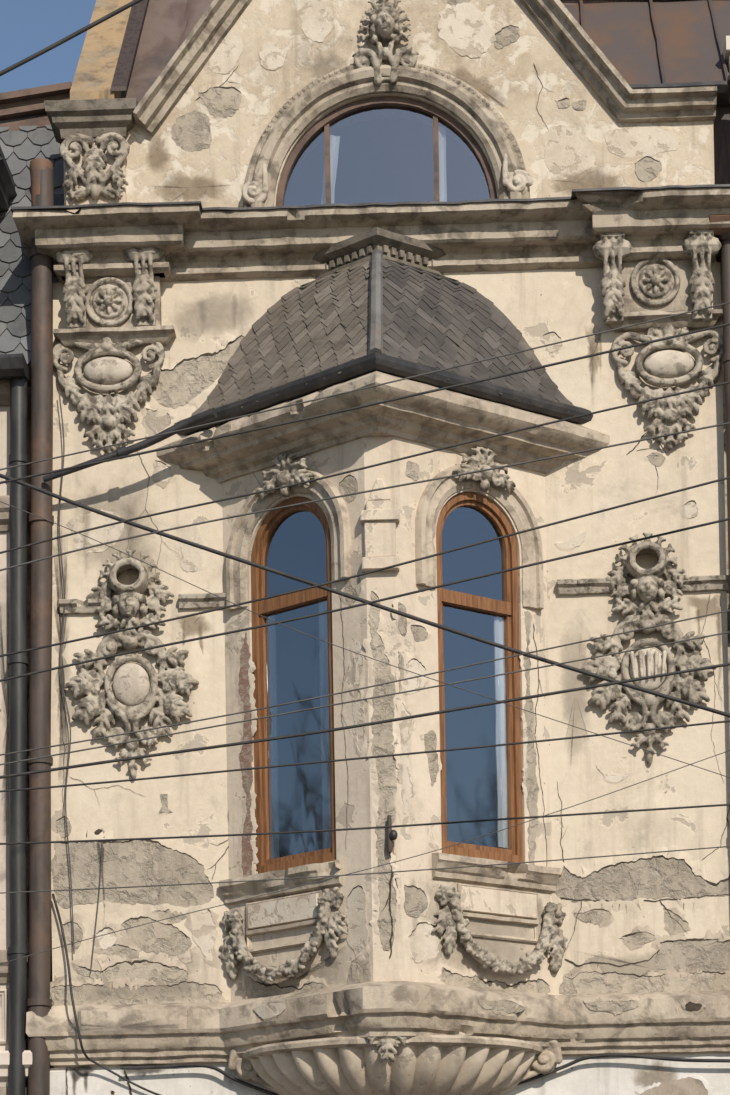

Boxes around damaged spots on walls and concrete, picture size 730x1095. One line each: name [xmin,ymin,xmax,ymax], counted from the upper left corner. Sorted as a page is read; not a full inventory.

flaking render [259,42,288,71]
flaking render [435,0,520,58]
flaking render [171,26,247,158]
flaking render [538,123,680,187]
flaking render [234,631,259,877]
flaking render [338,573,730,1016]
flaking render [50,816,226,1006]
leakage [69,1066,92,1090]
flaking render [635,1073,714,1095]